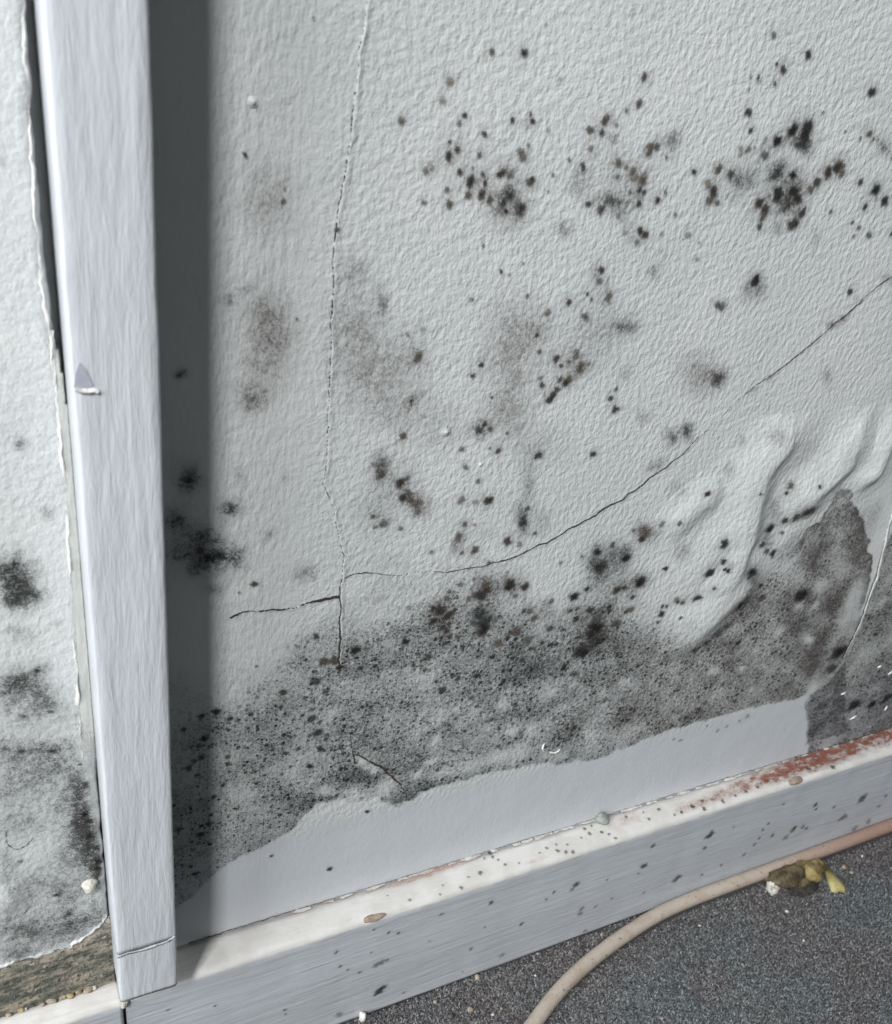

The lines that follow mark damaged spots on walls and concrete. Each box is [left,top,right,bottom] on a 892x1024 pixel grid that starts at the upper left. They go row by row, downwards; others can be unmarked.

water stain [444,140,530,221]
water stain [586,159,667,217]
water stain [739,120,844,229]
water stain [858,178,889,210]
crack [230,0,892,795]
water stain [540,350,590,403]
water stain [373,454,426,515]
water stain [0,555,42,609]
water stain [171,535,892,904]
corrosion [687,728,892,807]
water stain [0,740,103,958]
peeling [363,913,386,923]